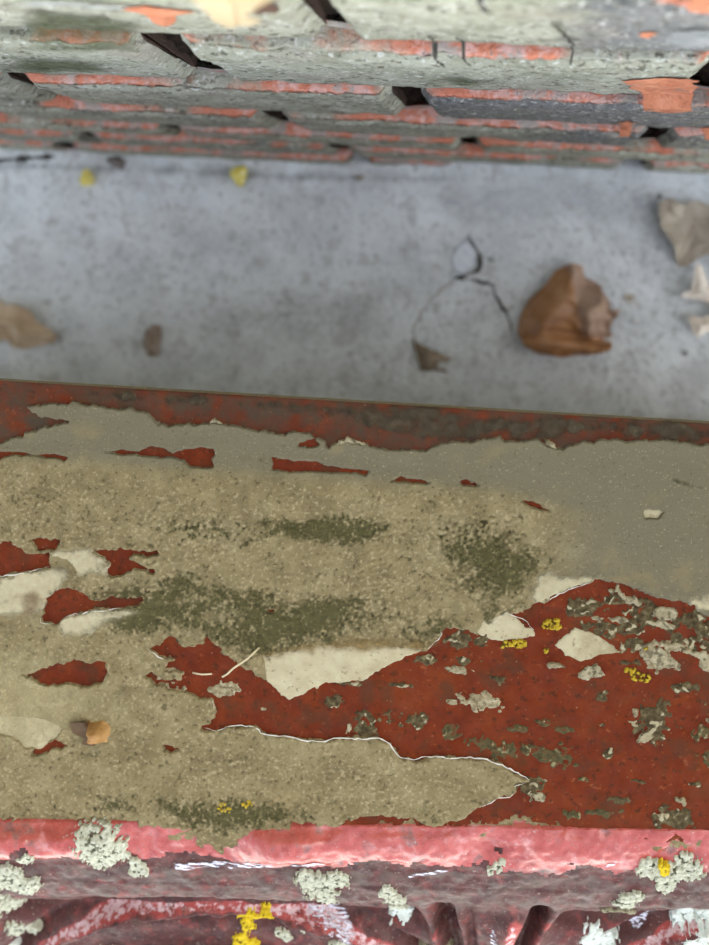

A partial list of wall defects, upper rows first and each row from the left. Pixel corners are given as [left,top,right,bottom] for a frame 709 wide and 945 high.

spalling [124,6,195,26]
spalling [253,2,280,14]
spalling [686,0,709,13]
spalling [624,78,699,113]
spalling [618,121,639,137]
peeling [0,381,709,461]
peeling [111,446,215,468]
peeling [272,457,368,475]
flaking render [0,538,159,635]
peeling [27,659,107,686]
peeling [146,573,709,843]